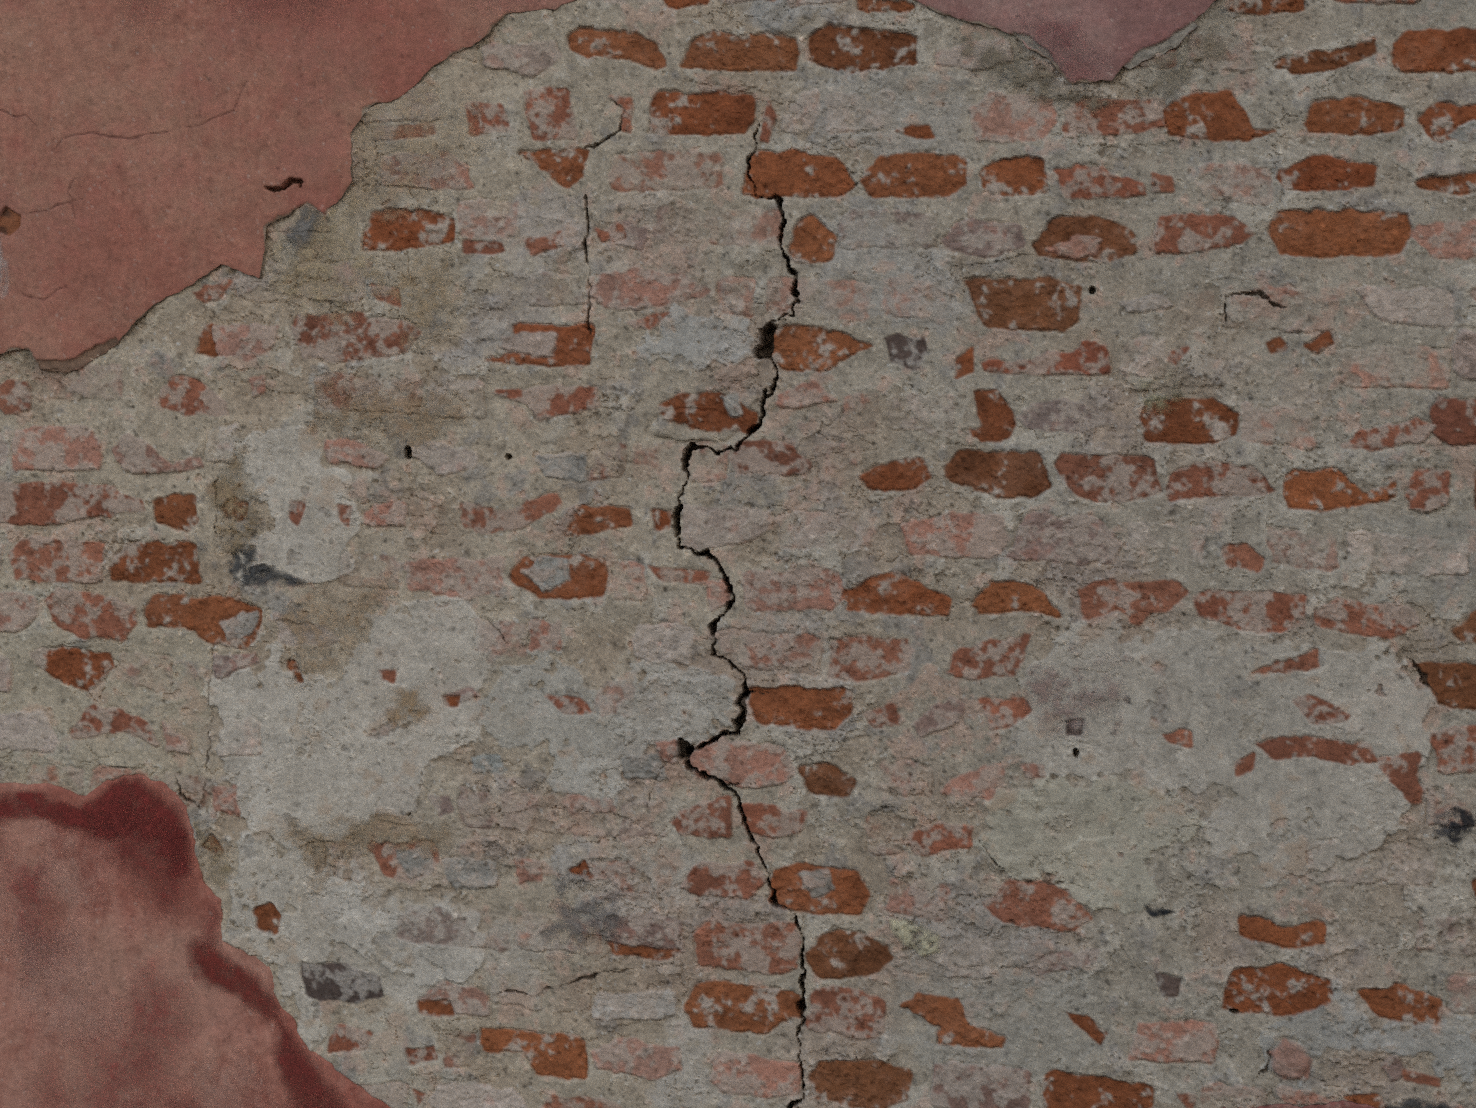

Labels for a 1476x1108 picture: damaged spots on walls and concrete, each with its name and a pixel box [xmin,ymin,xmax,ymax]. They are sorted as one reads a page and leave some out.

spalling [568,25,919,74]
spalling [1274,27,1476,75]
flaking render [0,0,576,374]
spalling [743,149,968,200]
spalling [1033,155,1412,265]
spalling [861,390,1052,500]
spalling [111,493,263,651]
crack [647,124,807,1108]
spalling [749,686,854,732]
flaking render [0,774,390,1108]
spalling [768,863,894,981]
spalling [1223,916,1334,1018]